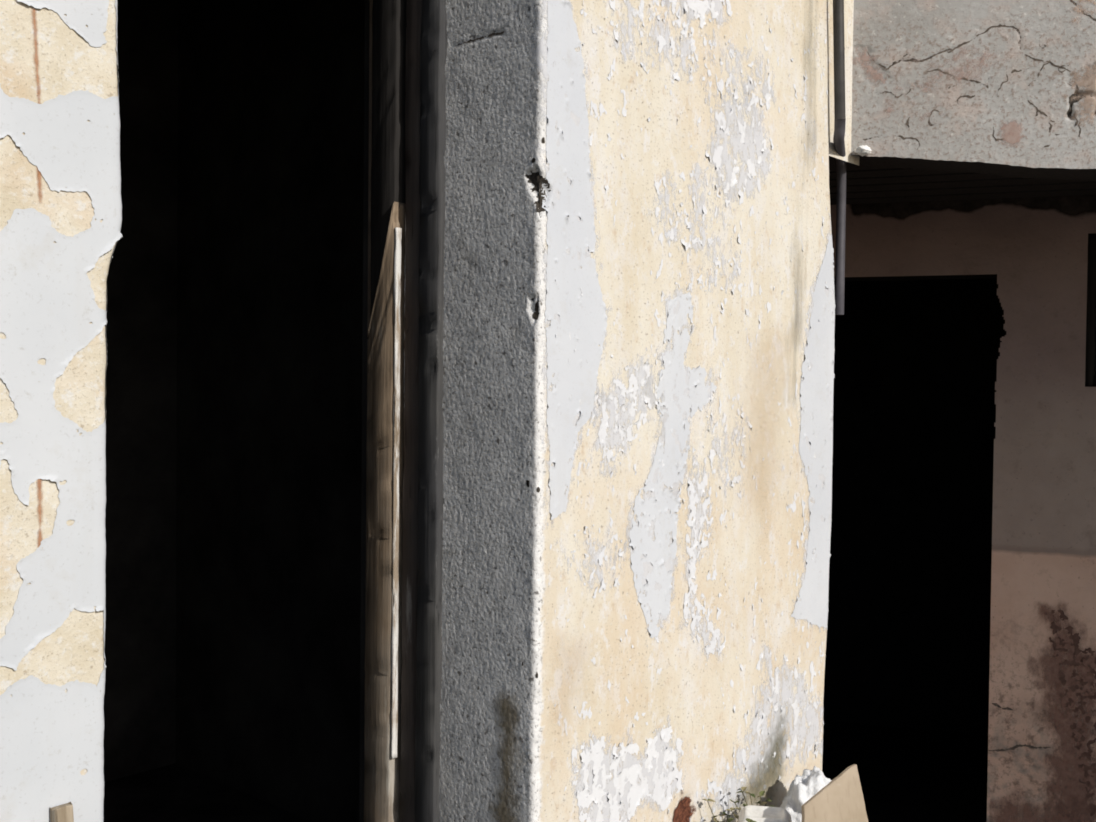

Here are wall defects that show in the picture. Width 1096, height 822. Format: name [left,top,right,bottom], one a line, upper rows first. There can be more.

peeling [0,0,119,108]
crack [863,24,1081,150]
peeling [0,128,99,242]
peeling [48,230,123,435]
peeling [525,0,828,669]
peeling [0,446,66,643]
peeling [690,192,835,822]
peeling [0,600,106,699]
damp [494,698,517,822]
peeling [554,697,684,822]
rust [673,793,696,822]
damp [991,605,1096,822]